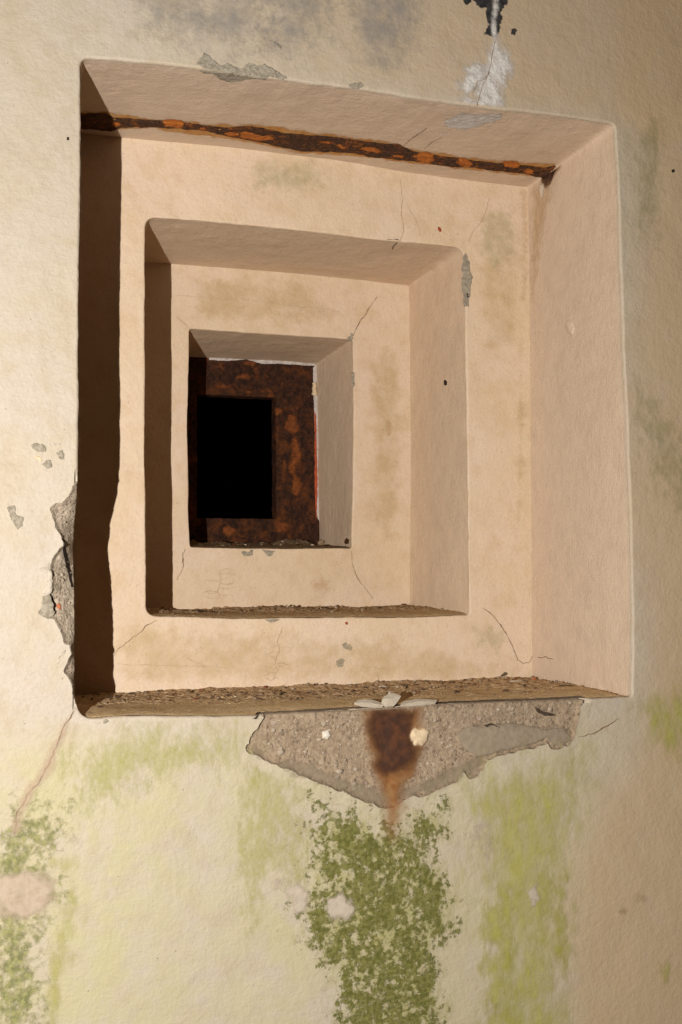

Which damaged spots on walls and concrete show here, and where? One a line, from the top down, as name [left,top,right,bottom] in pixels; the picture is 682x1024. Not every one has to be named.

flaking render [195,53,287,82]
water stain [444,0,513,134]
rust [80,112,560,197]
flaking render [461,254,473,307]
rust [276,409,302,495]
peeling [7,505,24,530]
spalling [27,443,78,715]
crack [485,609,552,664]
crack [14,711,74,832]
rust [367,710,420,822]
spalling [233,693,592,820]